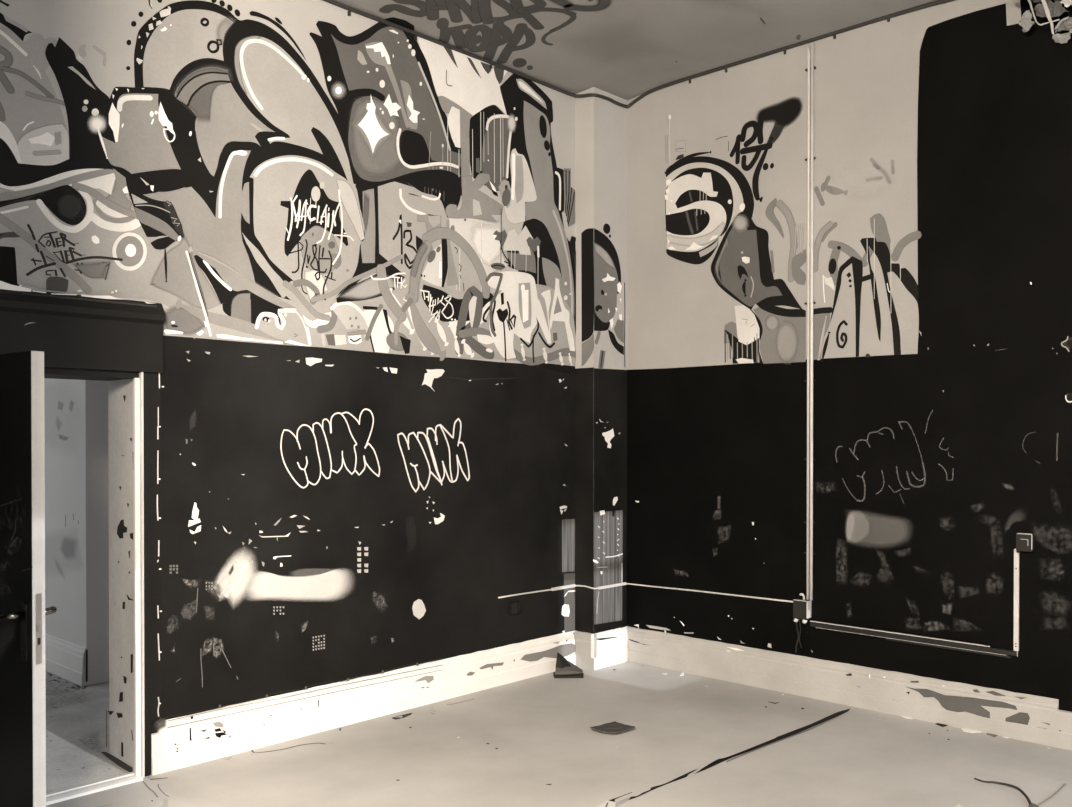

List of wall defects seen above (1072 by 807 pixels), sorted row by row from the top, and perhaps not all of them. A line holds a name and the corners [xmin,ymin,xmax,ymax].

peeling [286,358,333,366]
peeling [422,369,444,389]
peeling [596,421,621,448]
peeling [188,502,201,544]
peeling [242,515,320,548]
peeling [906,681,1061,731]
crack [609,708,851,807]